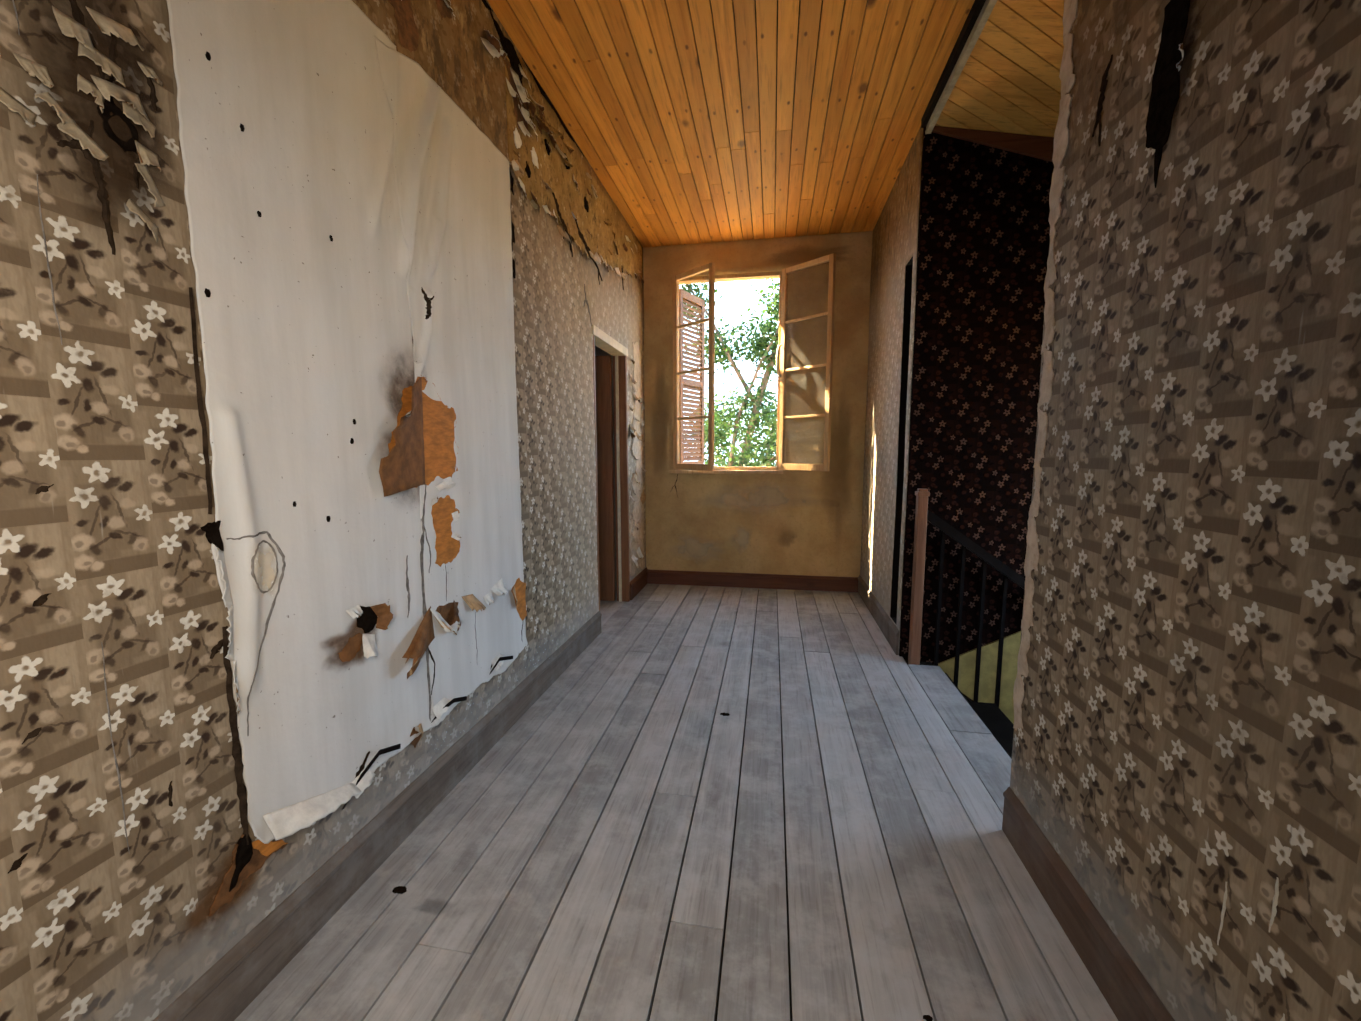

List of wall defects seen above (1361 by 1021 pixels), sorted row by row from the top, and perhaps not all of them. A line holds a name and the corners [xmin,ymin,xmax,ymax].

spalling [0,6,166,242]
peeling [388,0,419,52]
peeling [435,0,455,19]
flaking render [480,0,644,283]
spalling [1146,0,1198,188]
spalling [356,606,378,634]